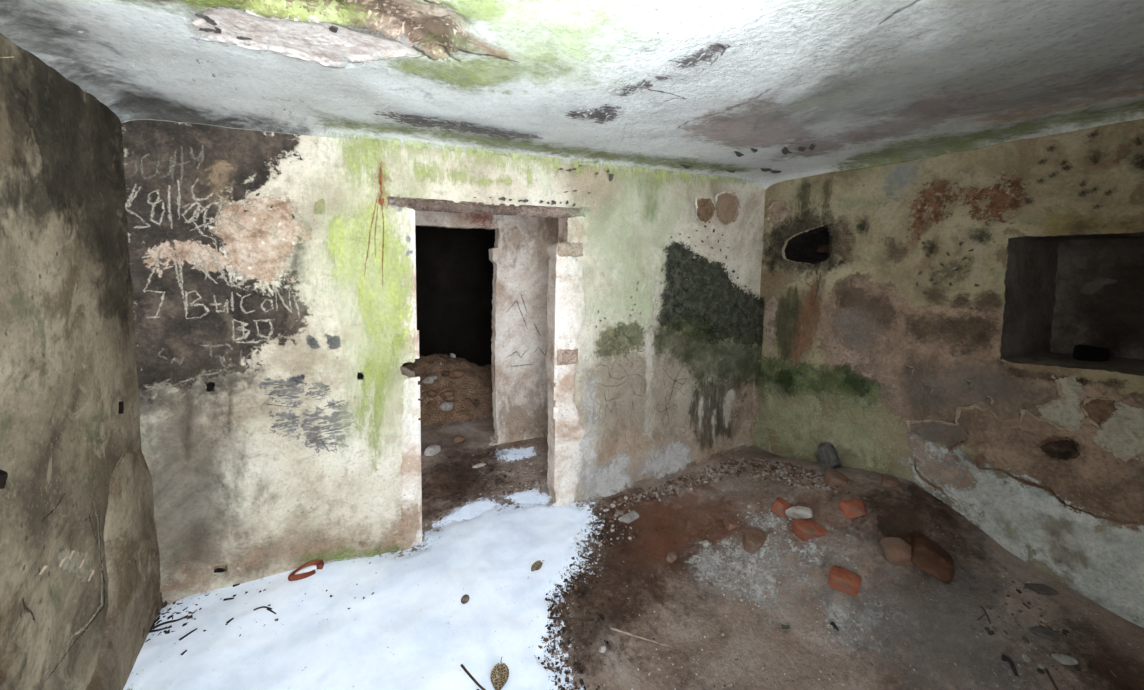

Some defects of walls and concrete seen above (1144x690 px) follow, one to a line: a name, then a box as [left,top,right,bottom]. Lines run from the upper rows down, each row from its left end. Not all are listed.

spalling [185,0,473,68]
spalling [143,153,312,284]
corrosion [364,161,384,287]
spalling [695,189,742,225]
leakage [799,182,832,216]
leakage [356,336,404,468]
leakage [581,214,1144,532]
peeling [906,420,965,445]
peeling [1036,375,1144,463]
leakage [149,390,420,593]
peeling [975,453,1138,524]